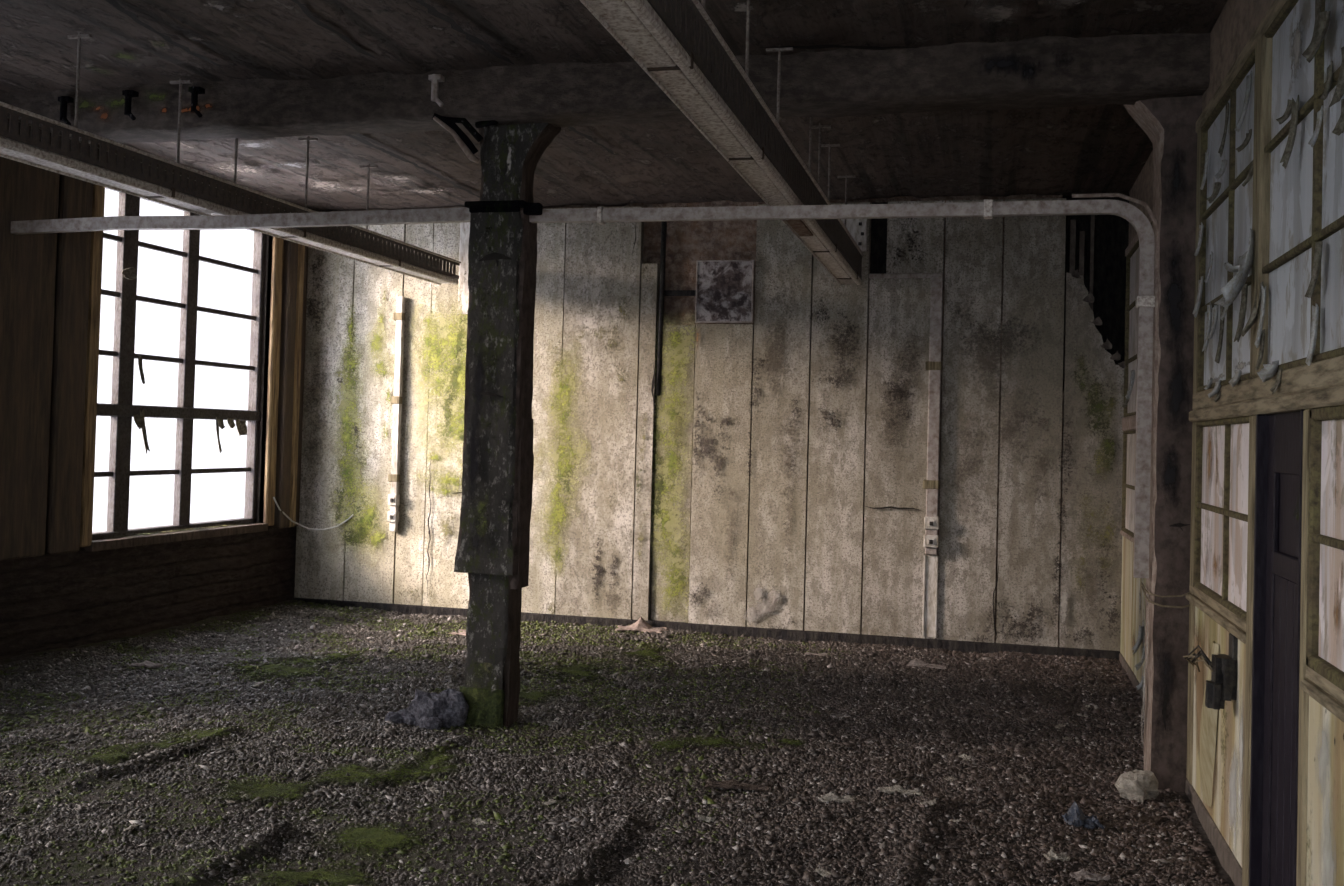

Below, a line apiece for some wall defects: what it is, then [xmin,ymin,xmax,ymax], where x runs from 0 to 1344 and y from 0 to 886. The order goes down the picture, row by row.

damp [431,321,485,496]
damp [812,297,857,431]
damp [881,341,916,447]
damp [1164,247,1189,426]
damp [335,490,385,548]
damp [434,512,456,551]